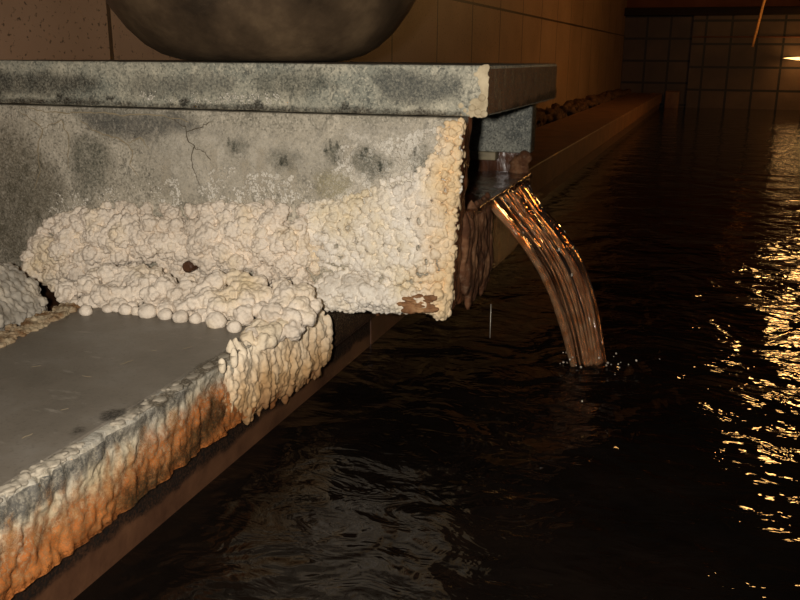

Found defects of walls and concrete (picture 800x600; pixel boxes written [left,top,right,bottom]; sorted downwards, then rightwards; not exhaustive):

crack [170,118,211,183]
leakage [0,64,557,600]
corrosion [0,384,256,600]